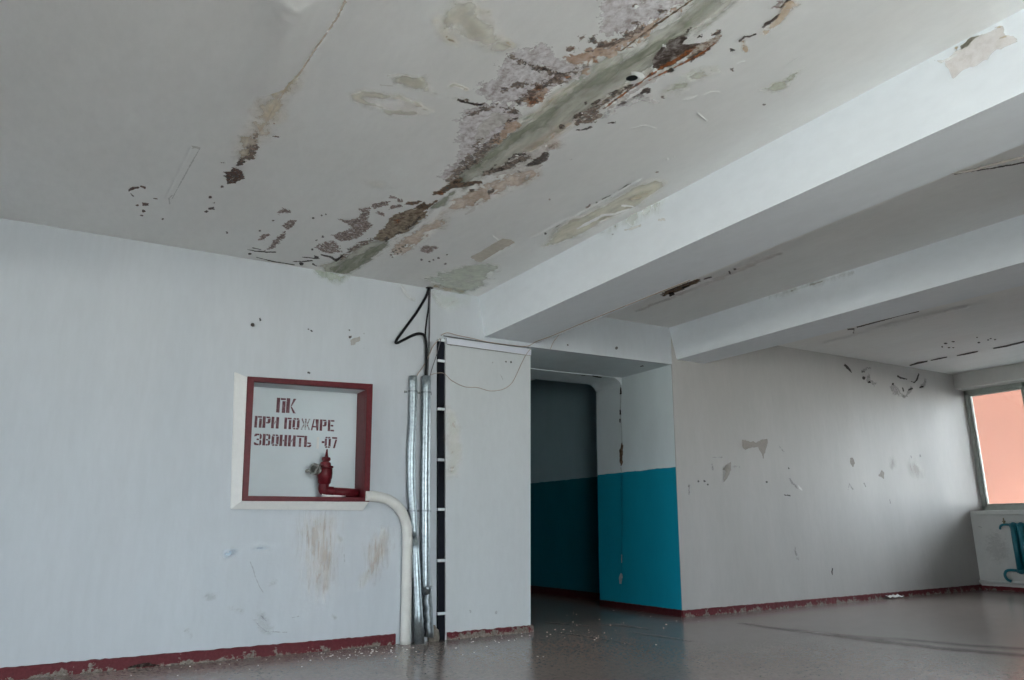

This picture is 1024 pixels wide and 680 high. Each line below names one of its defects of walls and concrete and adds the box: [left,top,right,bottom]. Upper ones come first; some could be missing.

crack [240,0,346,154]
damp [460,0,724,183]
rust [603,43,715,111]
spalling [652,27,722,73]
flaking render [938,26,1017,78]
flaking render [247,0,693,266]
damp [323,241,387,273]
flaking render [660,277,712,297]
peeling [742,439,768,458]